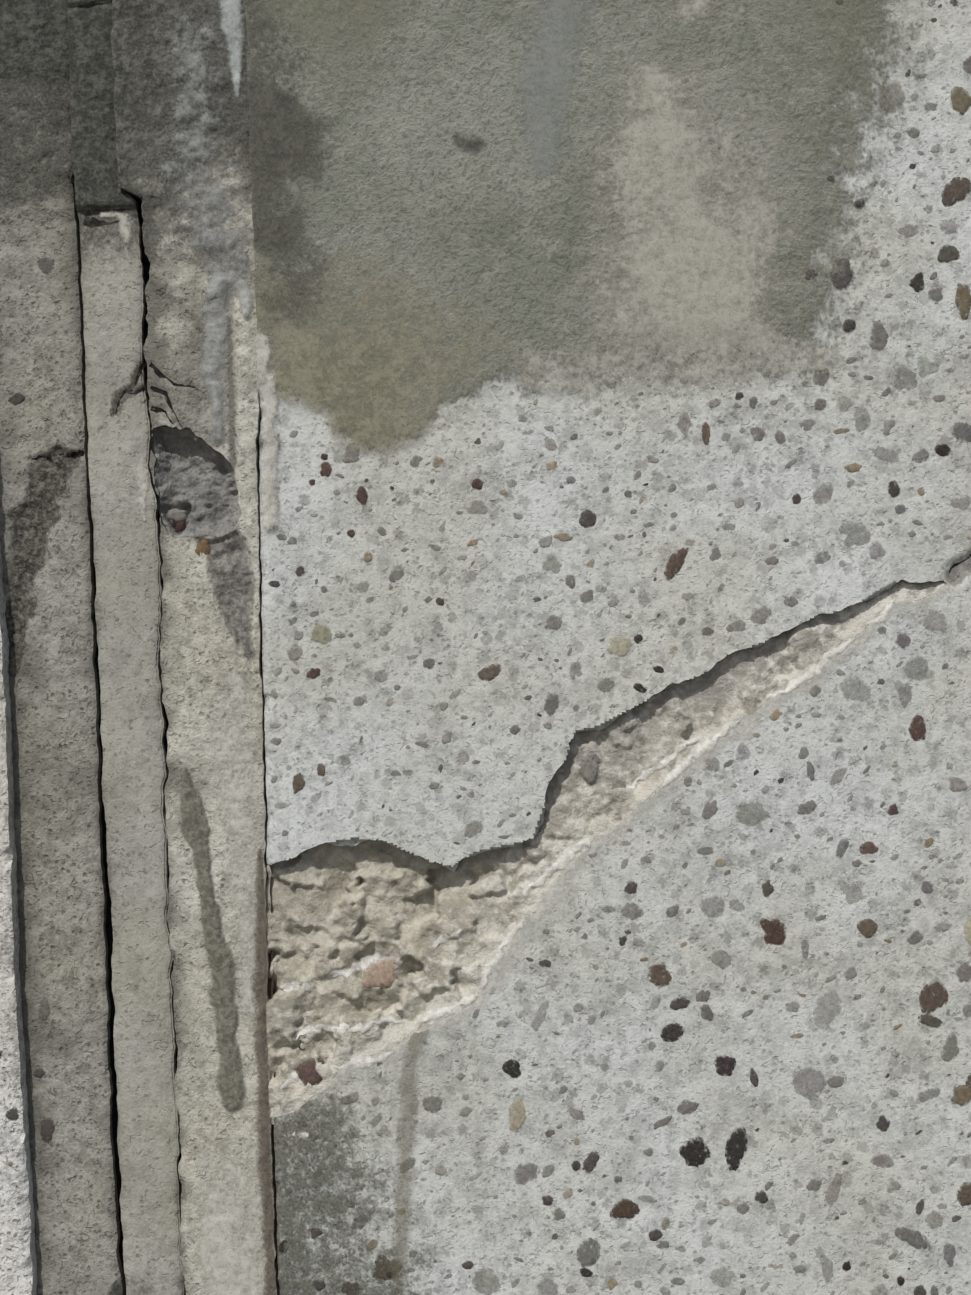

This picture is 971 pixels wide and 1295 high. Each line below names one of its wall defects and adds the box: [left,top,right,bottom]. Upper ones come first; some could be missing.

water stain [677,0,710,24]
water stain [514,61,841,394]
crack [947,550,971,585]
crack [32,177,199,1295]
spalling [136,426,961,1143]
water stain [273,1096,432,1295]